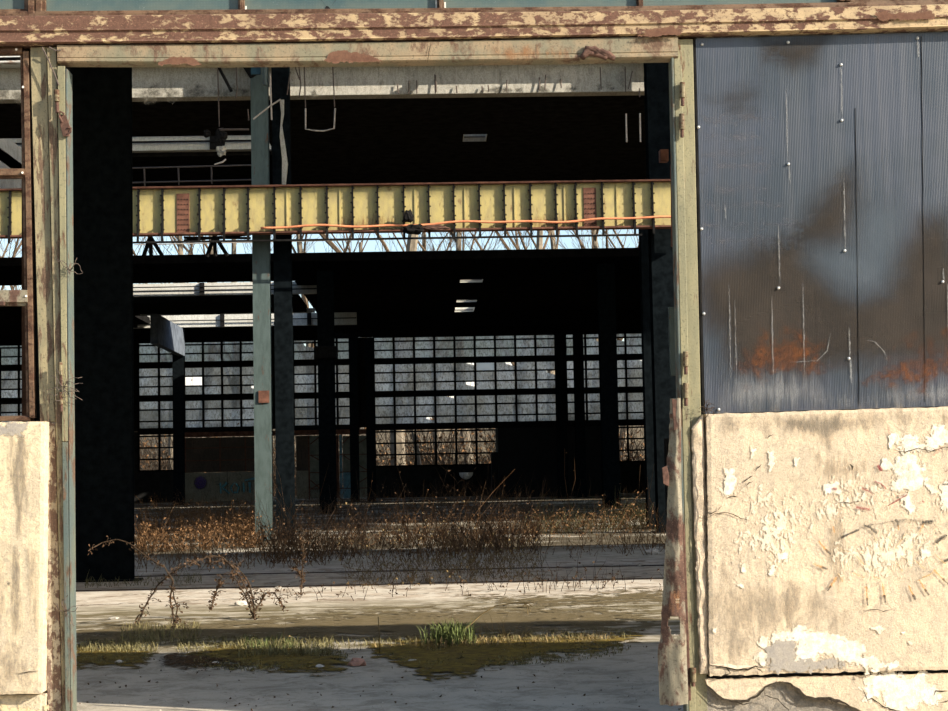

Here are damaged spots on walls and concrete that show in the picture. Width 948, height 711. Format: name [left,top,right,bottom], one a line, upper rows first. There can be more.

corrosion [875,10,936,21]
spalling [0,421,30,437]
peeling [714,424,948,594]
peeling [752,624,943,711]